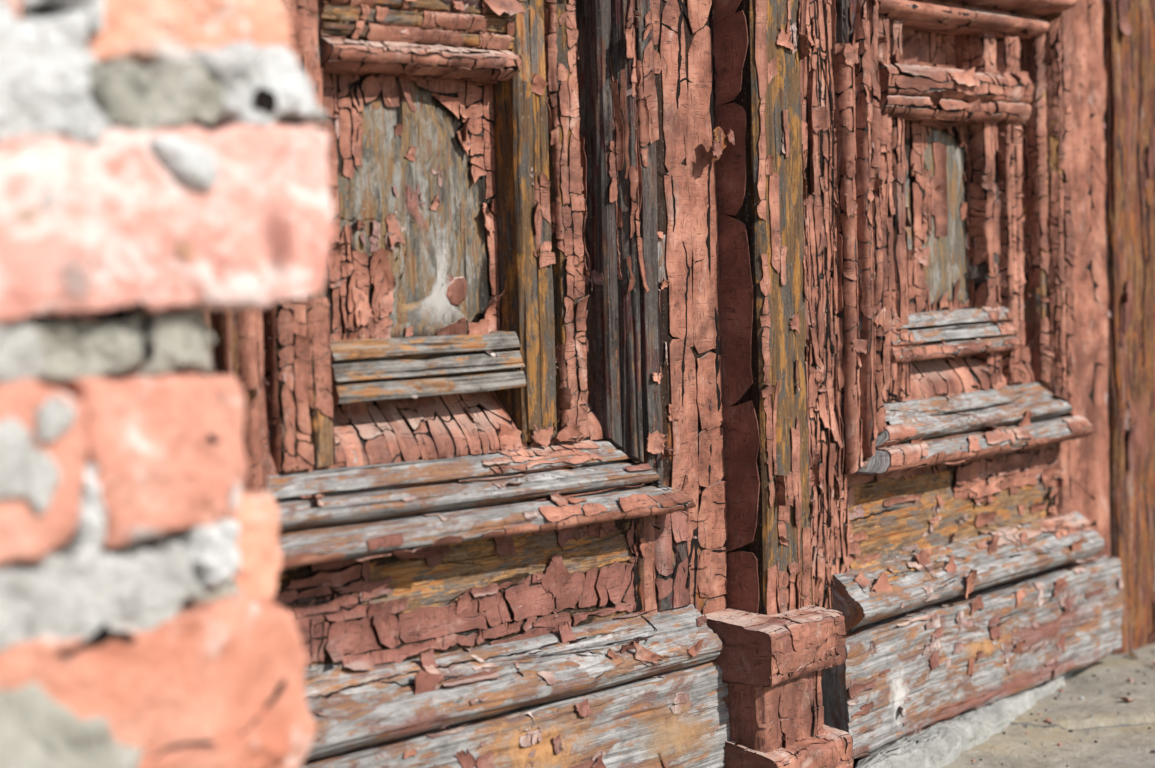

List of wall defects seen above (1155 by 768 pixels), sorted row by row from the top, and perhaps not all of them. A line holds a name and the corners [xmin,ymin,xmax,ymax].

peeling [320,0,548,95]
peeling [923,67,980,92]
peeling [329,84,497,338]
crack [655,0,728,505]
peeling [905,128,991,311]
peeling [458,421,594,493]
peeling [646,372,690,507]
peeling [886,391,1064,444]
peeling [358,517,651,631]
crack [633,524,729,631]
peeling [846,460,1089,677]
spalling [143,621,704,768]